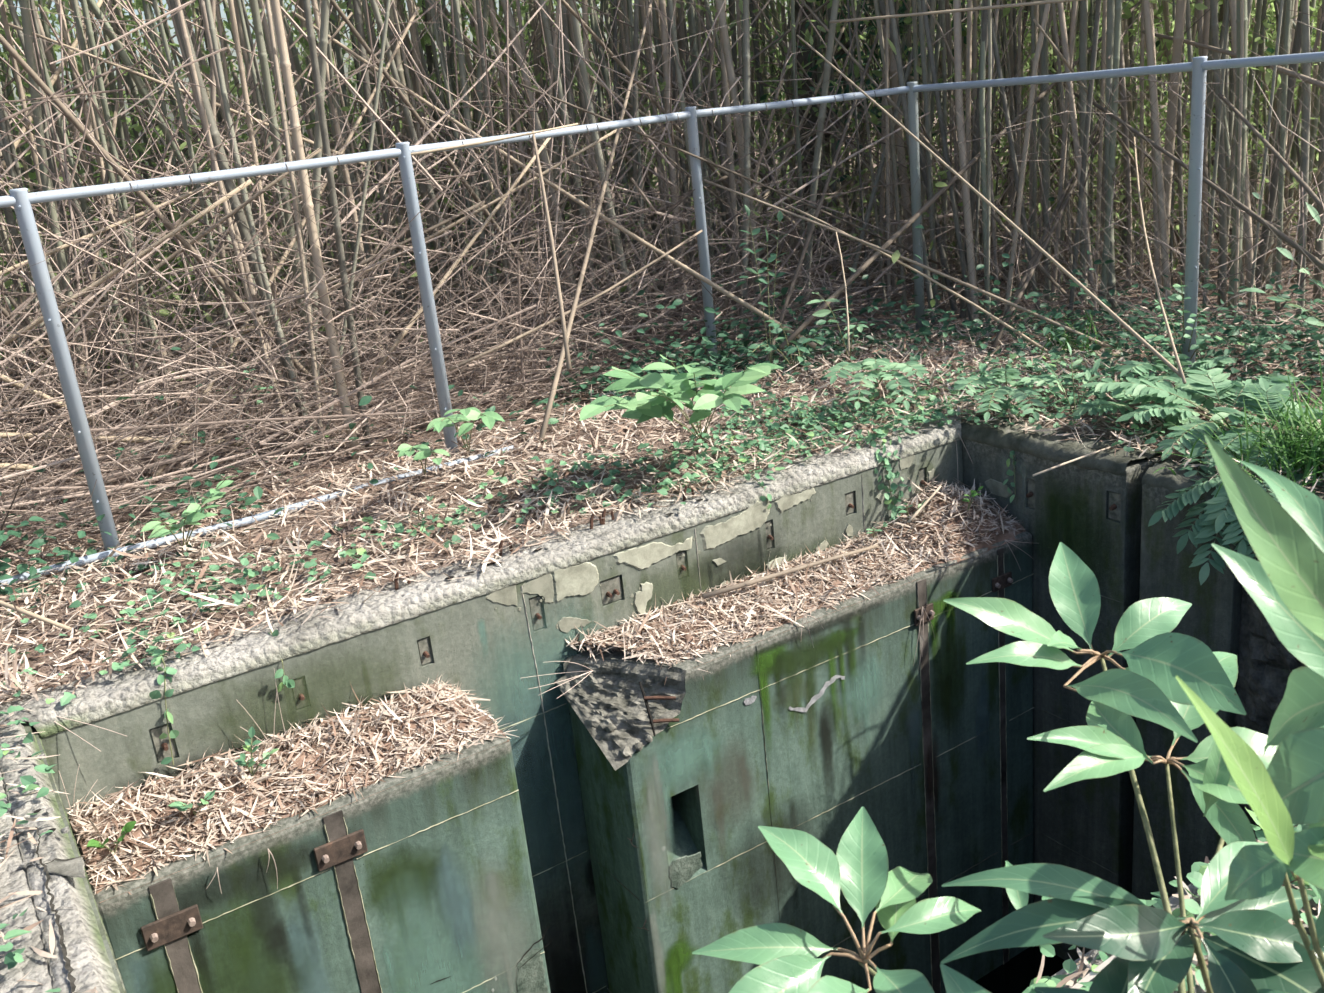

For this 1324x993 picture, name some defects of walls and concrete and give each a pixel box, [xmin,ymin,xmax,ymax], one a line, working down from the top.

spalling [1291,479,1324,500]
spalling [0,407,1306,993]
spalling [1294,903,1318,936]